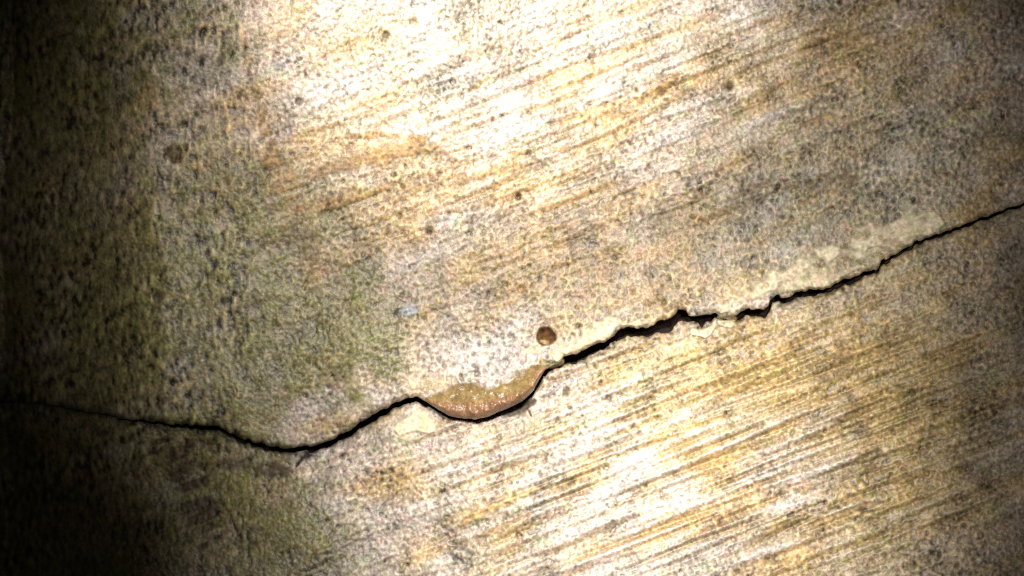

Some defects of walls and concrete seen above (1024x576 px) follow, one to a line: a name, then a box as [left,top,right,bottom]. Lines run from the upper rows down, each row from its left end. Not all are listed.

crack [0,203,1024,467]